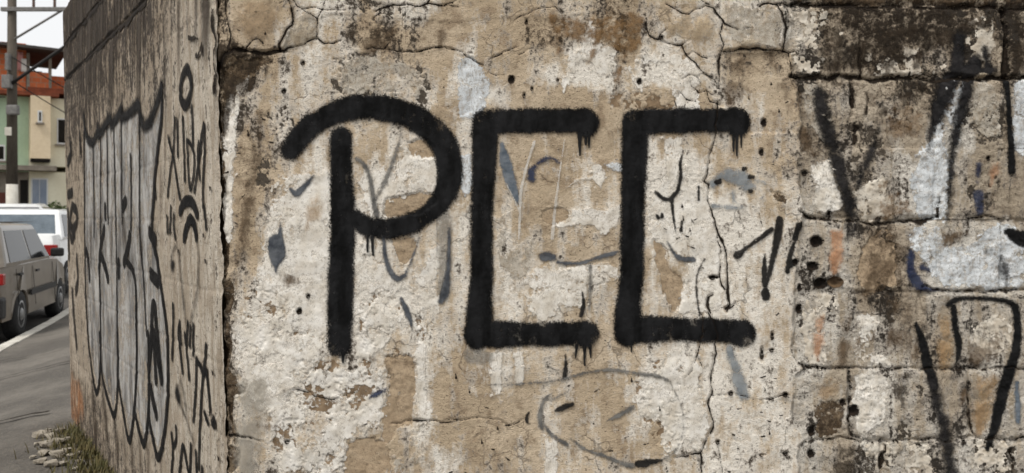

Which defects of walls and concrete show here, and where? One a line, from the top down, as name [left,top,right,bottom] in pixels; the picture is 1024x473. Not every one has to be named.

crack [373,0,458,18]
crack [367,43,532,76]
damp [821,0,991,69]
peeling [865,47,947,77]
spalling [725,3,898,293]
peeling [909,80,1024,293]
crack [644,0,798,472]
peeling [793,259,844,370]
peeling [971,314,1013,371]
peeling [808,314,941,473]
peeling [956,438,1017,473]